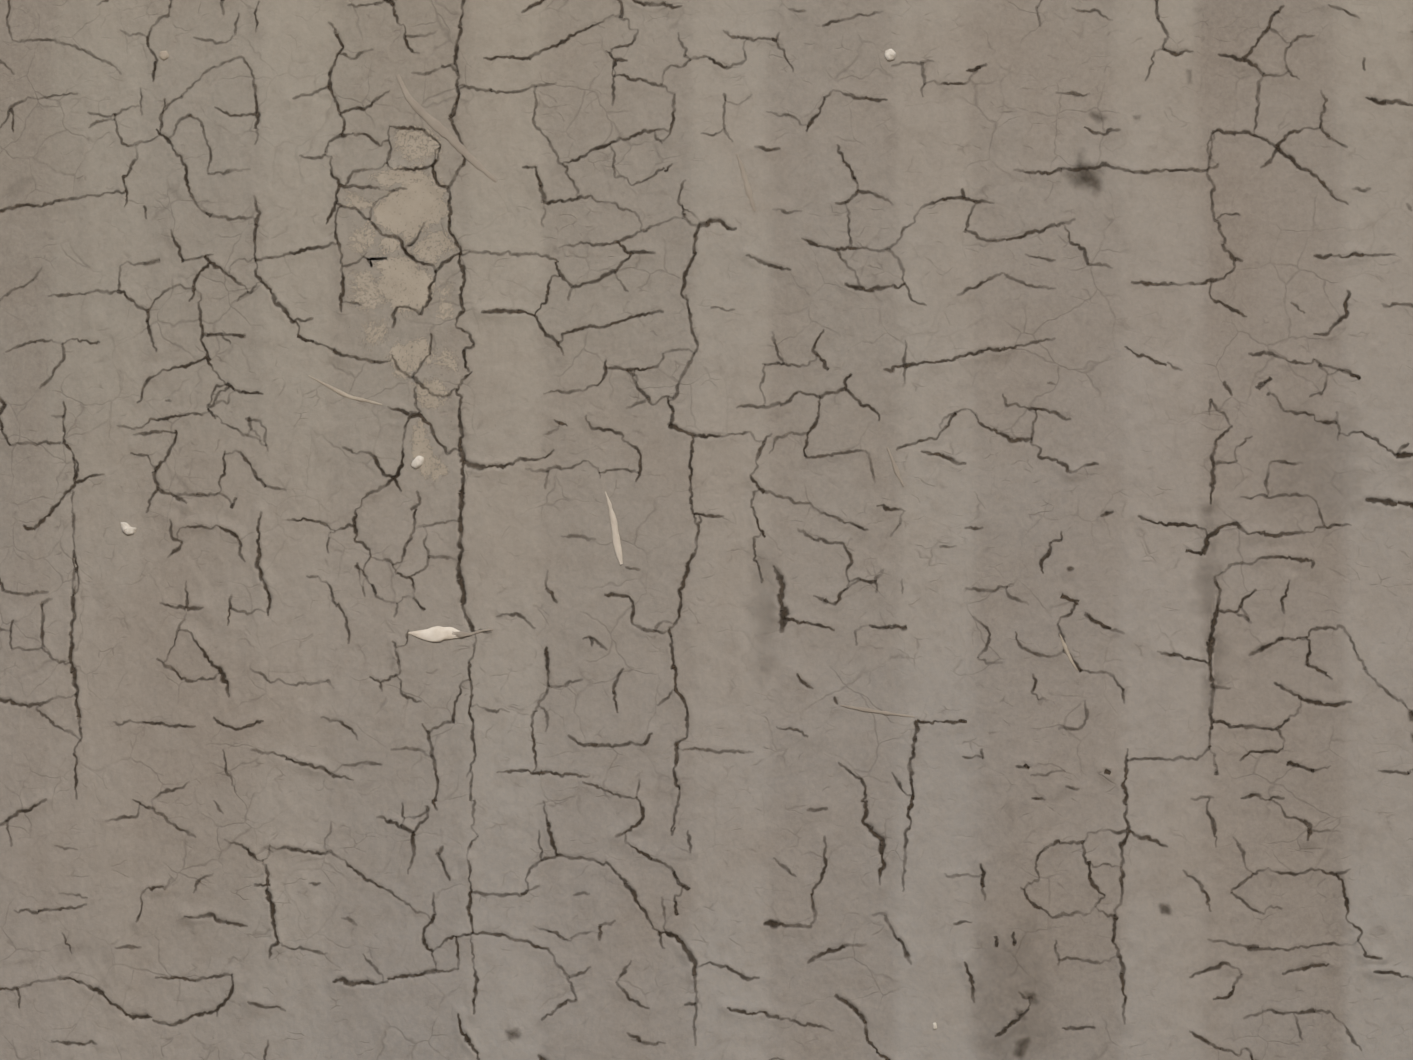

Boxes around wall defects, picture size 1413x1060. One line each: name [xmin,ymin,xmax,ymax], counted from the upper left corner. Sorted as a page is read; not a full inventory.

crack [0,198,73,212]
peeling [343,125,468,482]
crack [931,189,1089,291]
crack [1025,0,1343,317]
crack [1363,63,1413,106]
crack [0,339,99,530]
crack [899,404,1097,472]
crack [0,554,82,788]
crack [984,533,1111,691]
crack [1102,252,1413,999]
crack [4,802,41,833]
crack [1012,756,1164,1004]